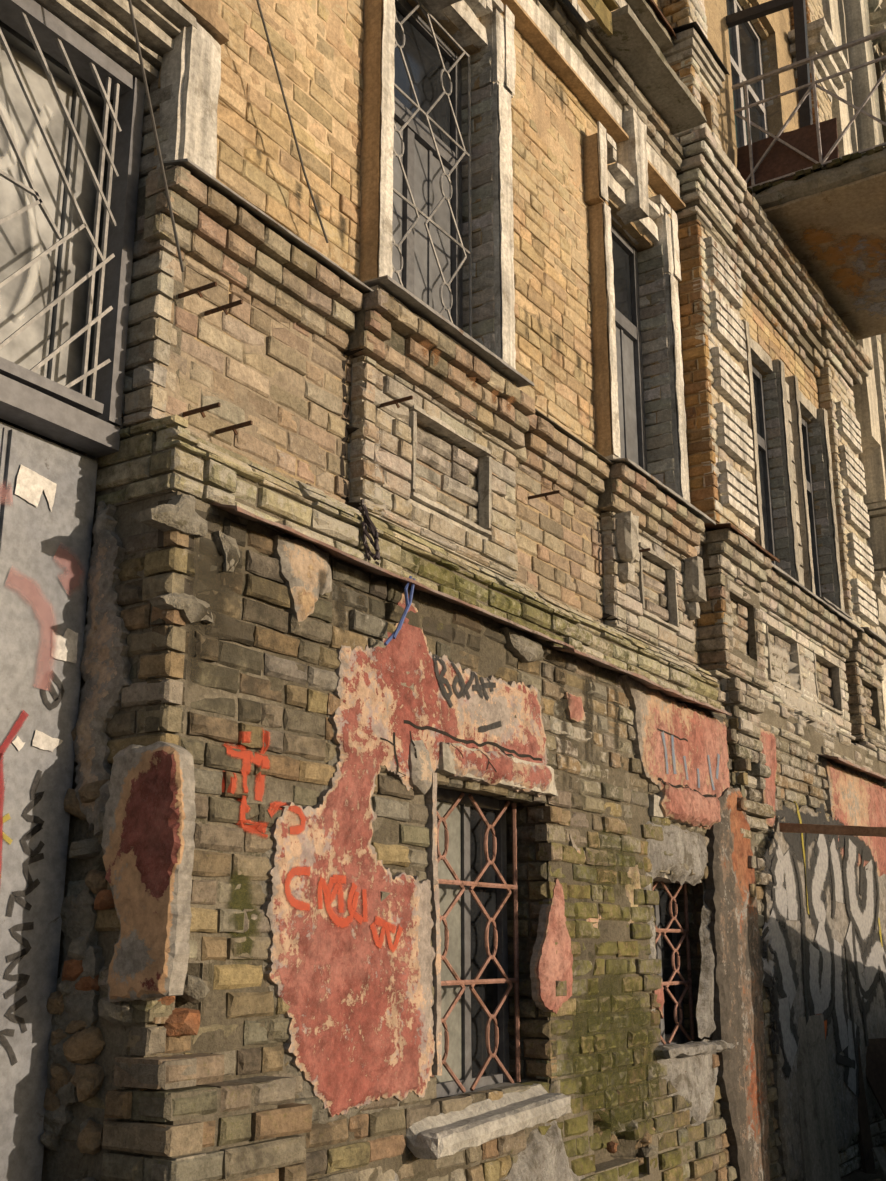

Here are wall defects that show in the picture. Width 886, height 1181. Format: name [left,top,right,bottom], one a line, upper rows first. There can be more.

flaking render [271,535,332,626]
flaking render [43,501,210,1111]
flaking render [260,584,552,1124]
flaking render [619,675,730,830]
flaking render [754,727,777,829]
flaking render [530,878,573,1014]